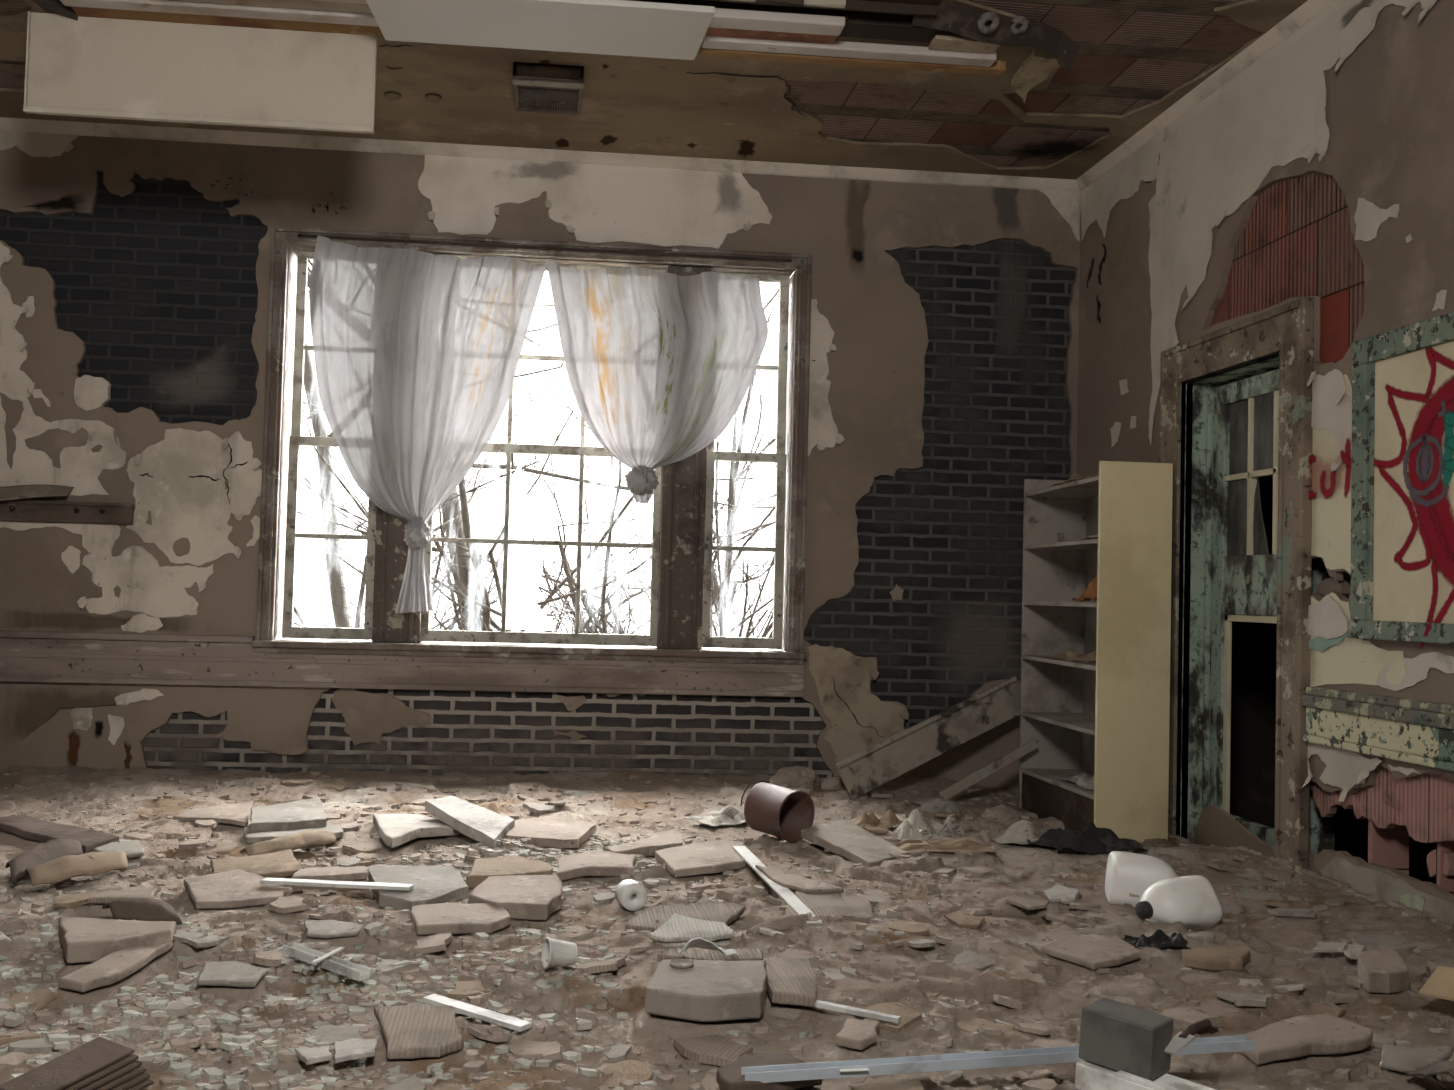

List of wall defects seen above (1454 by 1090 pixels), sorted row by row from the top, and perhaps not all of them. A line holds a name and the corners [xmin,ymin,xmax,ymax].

peeling [0,130,79,158]
peeling [71,688,164,745]
spalling [0,171,268,633]
spalling [142,239,1075,778]
peeling [785,0,1454,691]
spalling [1302,742,1454,924]